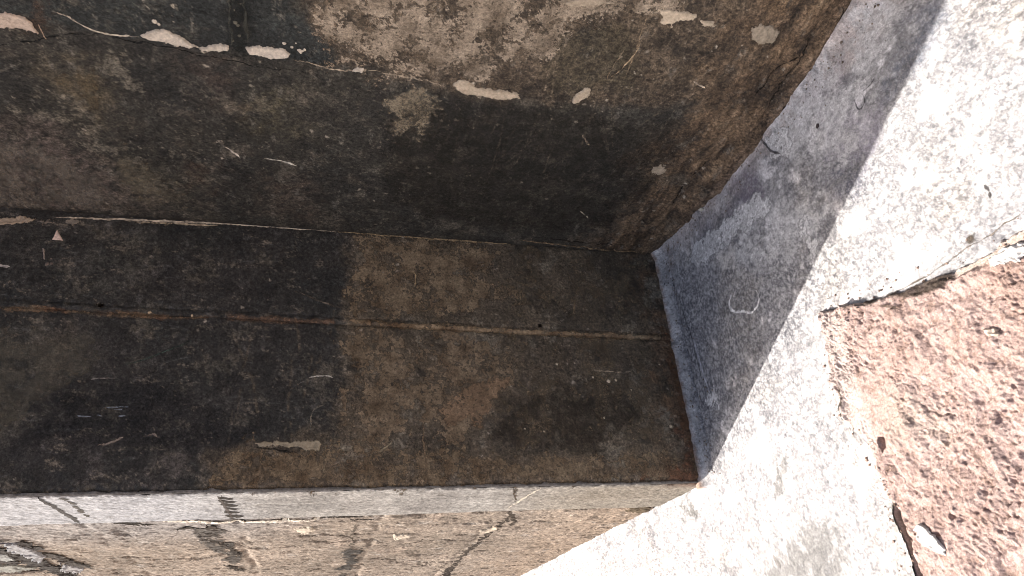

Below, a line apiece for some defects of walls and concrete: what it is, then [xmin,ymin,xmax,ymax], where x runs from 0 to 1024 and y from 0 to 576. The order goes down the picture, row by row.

flaking render [0,12,39,34]
flaking render [140,19,229,52]
flaking render [245,42,306,59]
peeling [310,0,716,142]
crack [756,39,812,116]
water stain [0,142,111,209]
peeling [208,234,698,502]